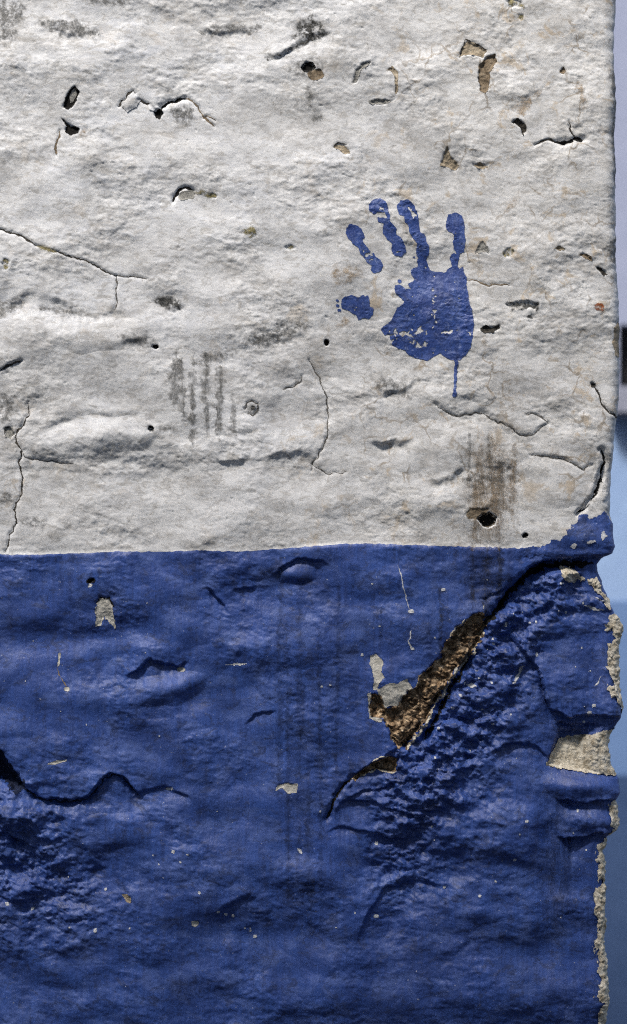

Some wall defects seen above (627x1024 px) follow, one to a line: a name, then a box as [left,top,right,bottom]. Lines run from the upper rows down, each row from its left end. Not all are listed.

flaking render [459,39,497,93]
flaking render [54,86,85,154]
crack [0,229,146,310]
crack [5,406,74,551]
leakage [169,352,236,437]
crack [283,361,346,475]
crack [434,403,592,470]
crack [591,383,617,418]
spalling [559,566,624,714]
spalling [352,606,487,781]
spalling [546,727,616,776]
spalling [592,800,620,1024]